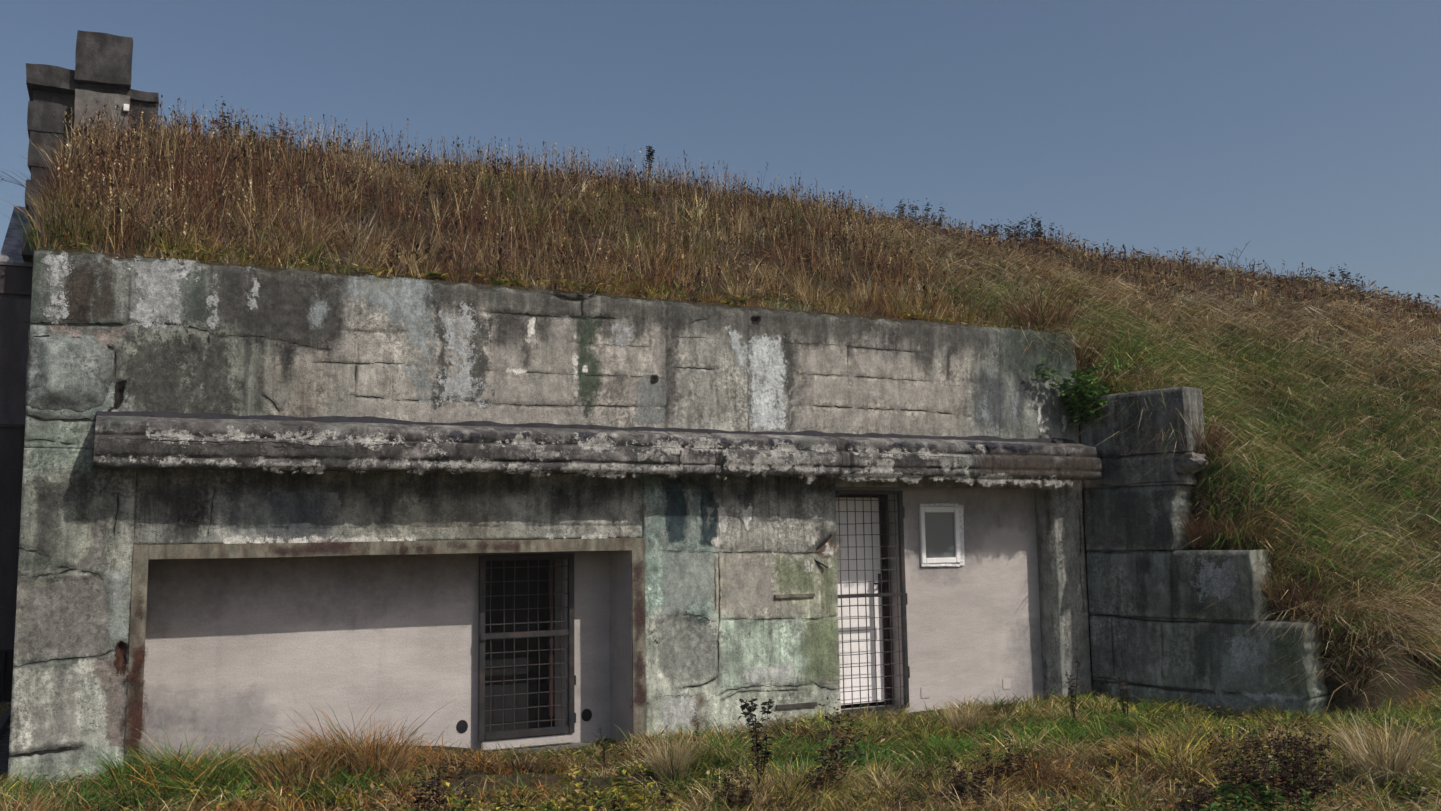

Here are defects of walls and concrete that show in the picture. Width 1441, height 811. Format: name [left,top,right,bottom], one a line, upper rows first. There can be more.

leakage [58,256,343,416]
peeling [245,266,260,310]
leakage [426,280,584,409]
leakage [568,401,614,443]
leakage [600,294,989,447]
peeling [98,275,1080,731]
leakage [662,476,836,546]
leakage [681,609,708,628]
rust [124,646,147,764]